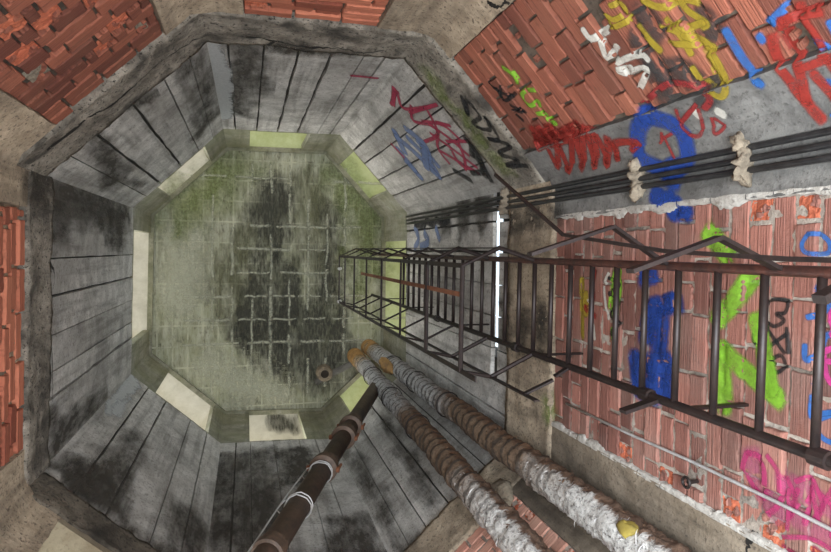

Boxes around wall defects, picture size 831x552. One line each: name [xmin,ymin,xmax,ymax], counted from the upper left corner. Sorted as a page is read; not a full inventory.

spalling [5,41,40,66]
spalling [0,5,63,41]
spalling [93,12,129,56]
flaking render [560,185,831,221]
water stain [162,164,405,409]
water stain [268,414,298,434]
water stain [50,397,140,536]
water stain [152,446,312,552]
water stain [326,454,391,552]
crack [745,530,759,552]